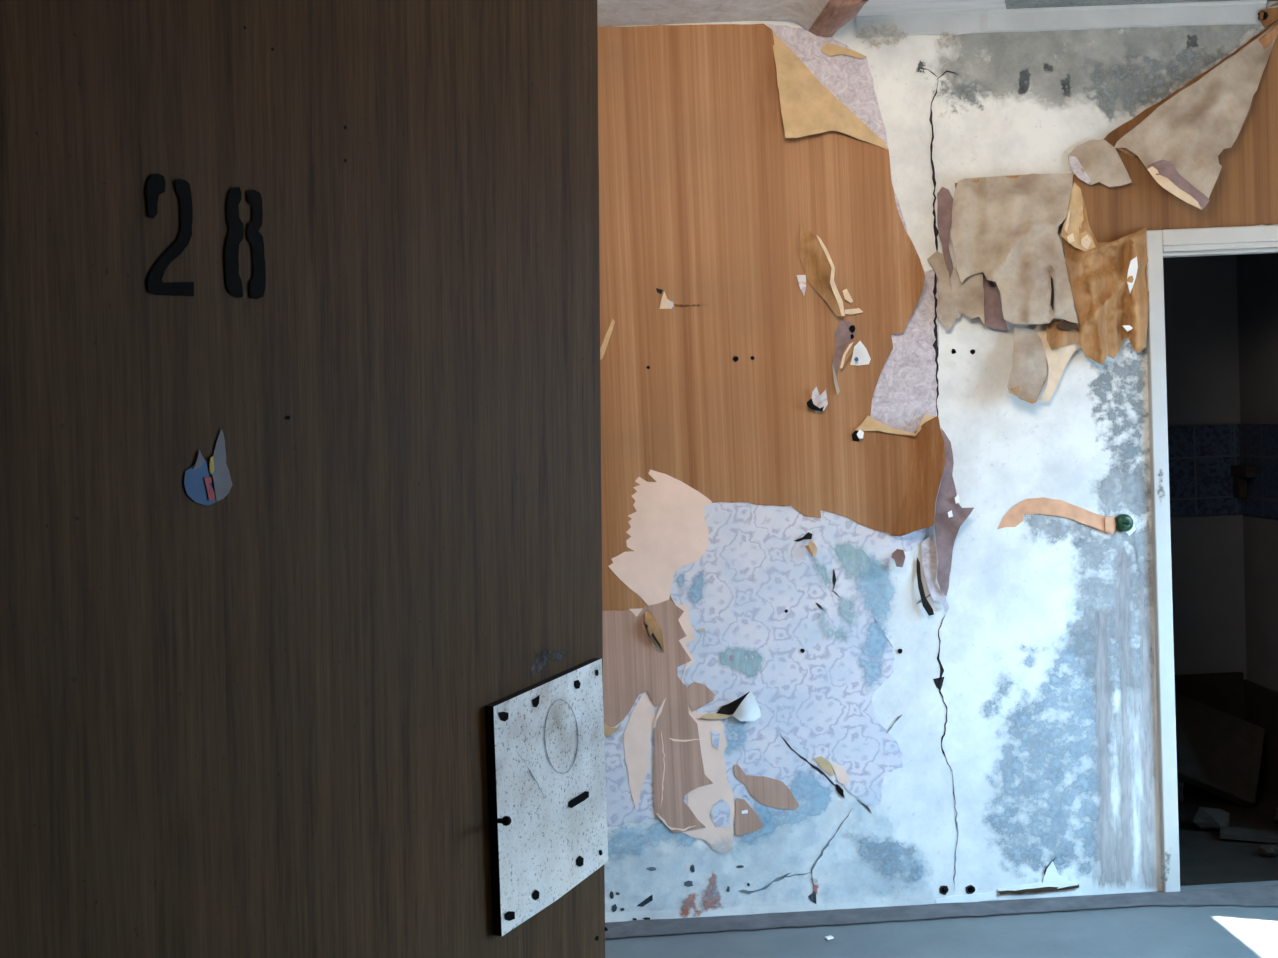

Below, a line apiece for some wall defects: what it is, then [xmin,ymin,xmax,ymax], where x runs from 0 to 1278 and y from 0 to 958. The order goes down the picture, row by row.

peeling [772,31,888,150]
crack [917,67,958,416]
spalling [806,387,828,413]
peeling [852,414,935,442]
peeling [927,11,1278,692]
peeling [794,532,818,557]
peeling [891,534,949,616]
crack [933,616,959,890]
leakage [987,551,1155,886]
crack [739,734,871,904]
spalling [609,891,653,920]
flaking render [936,857,1079,904]